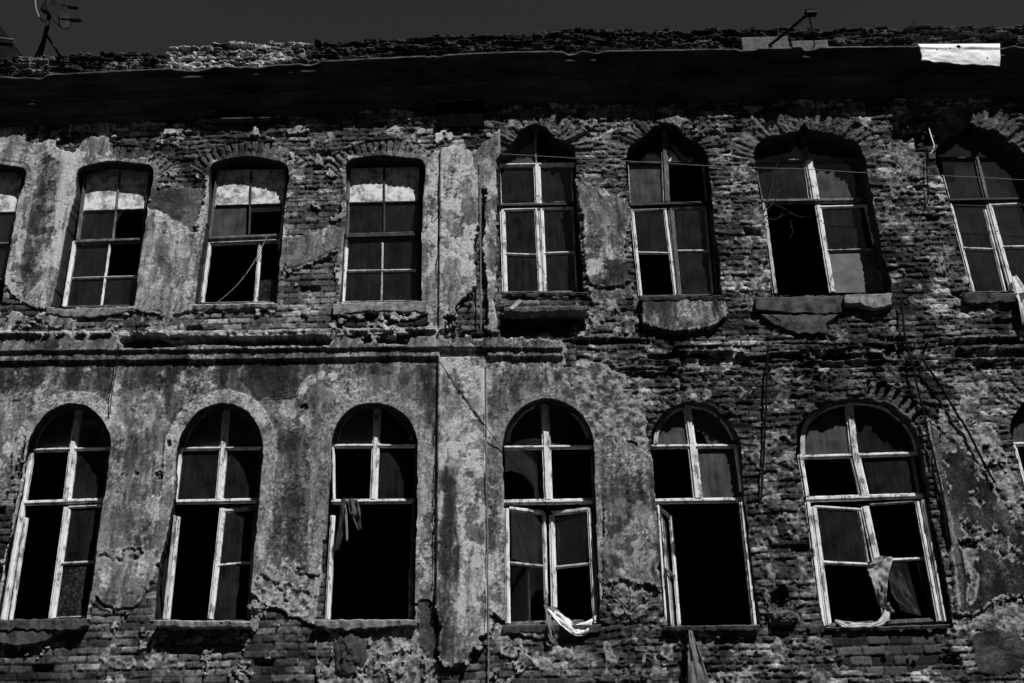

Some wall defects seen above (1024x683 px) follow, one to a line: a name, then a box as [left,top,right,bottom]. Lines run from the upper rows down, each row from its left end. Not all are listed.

peeling [0,251,430,349]
spalling [109,97,1024,683]
peeling [0,435,26,582]
peeling [0,539,344,683]
damp [438,469,458,650]